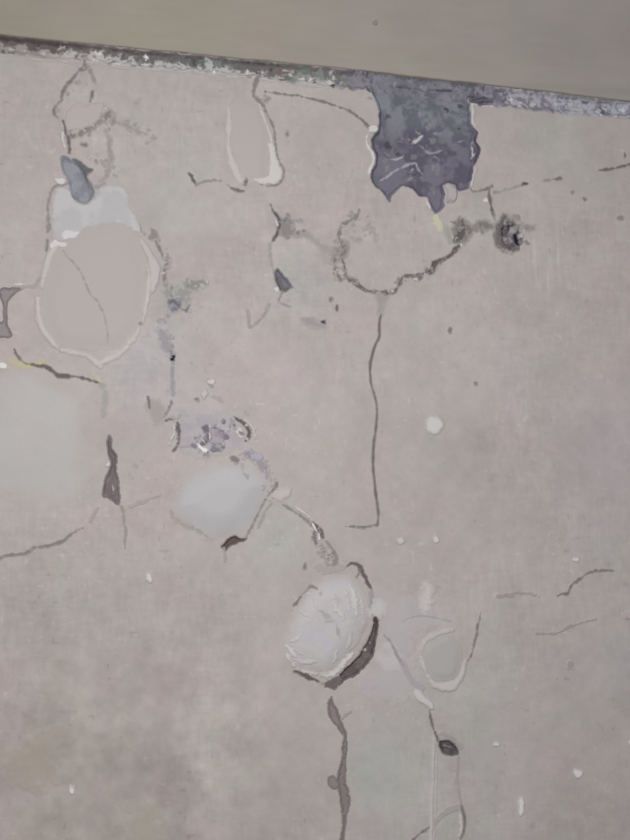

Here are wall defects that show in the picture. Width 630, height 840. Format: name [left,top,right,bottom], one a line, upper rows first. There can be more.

peeling [49,155,140,249]
crack [51,57,158,184]
flaking render [0,35,630,214]
crack [597,152,630,172]
crack [187,72,463,530]
crack [0,187,162,561]
flaking render [143,313,279,502]
crack [220,485,379,840]
crack [467,611,482,661]
crack [495,568,615,599]
crack [535,618,597,635]
crack [410,709,467,840]